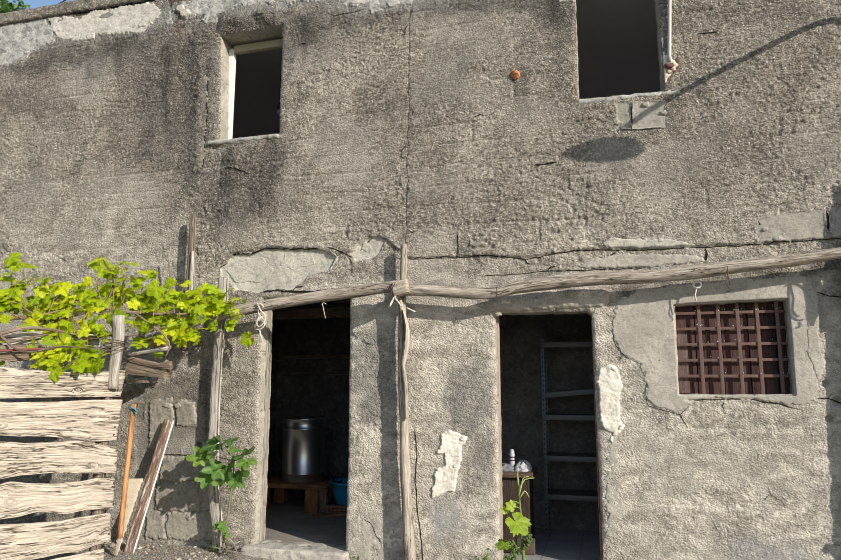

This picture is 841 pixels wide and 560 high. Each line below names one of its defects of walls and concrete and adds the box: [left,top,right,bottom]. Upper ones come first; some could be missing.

flaking render [0,0,324,66]
flaking render [342,0,416,14]
crack [401,6,840,276]
spalling [219,248,338,293]
spalling [349,234,387,262]
crack [643,373,800,426]
crack [414,426,423,560]